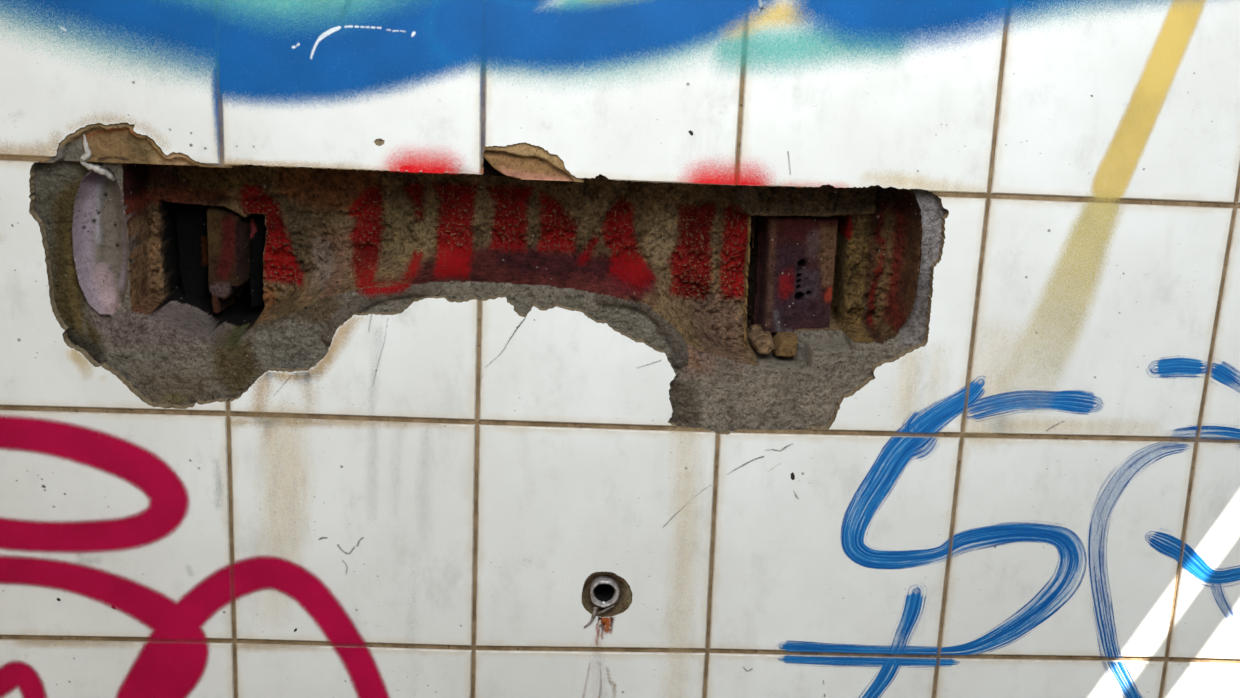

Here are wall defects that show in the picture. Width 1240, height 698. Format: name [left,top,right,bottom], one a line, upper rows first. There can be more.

spalling [33,114,946,434]
corrosion [582,616,617,698]